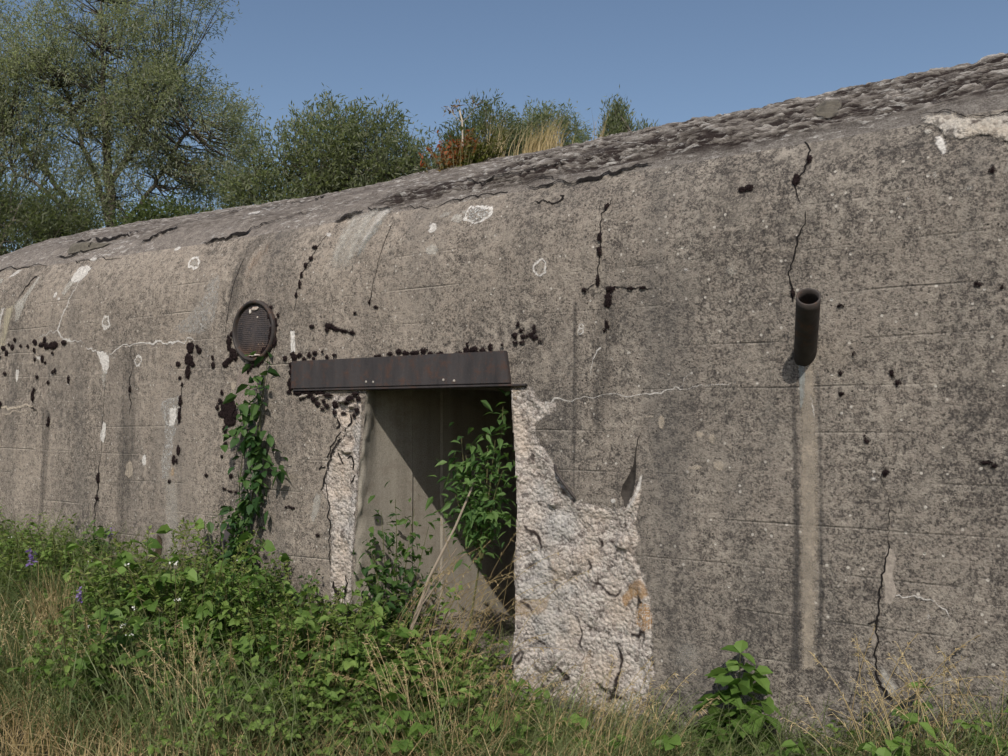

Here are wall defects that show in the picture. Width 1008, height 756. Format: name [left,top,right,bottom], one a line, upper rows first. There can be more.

spalling [922,113,1008,153]
crack [203,161,652,332]
crack [788,141,813,302]
crack [319,428,355,565]
spalling [511,387,655,734]
water stain [792,364,823,668]
crack [868,474,948,700]